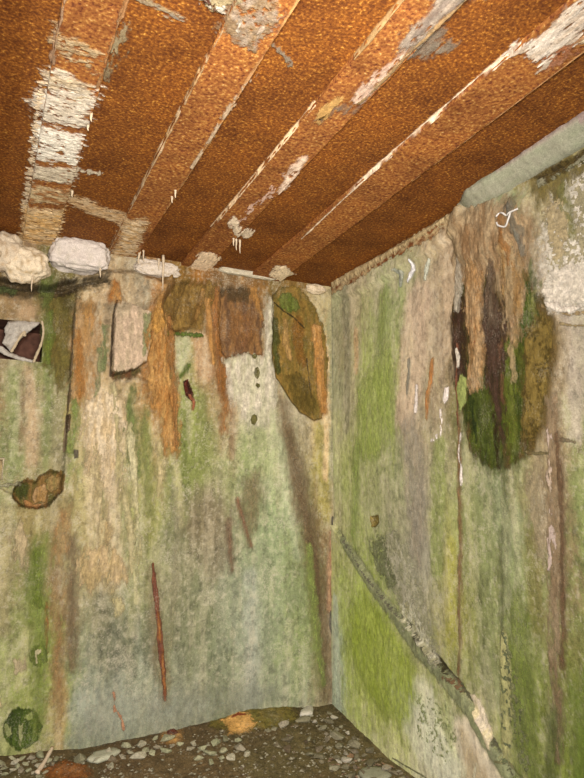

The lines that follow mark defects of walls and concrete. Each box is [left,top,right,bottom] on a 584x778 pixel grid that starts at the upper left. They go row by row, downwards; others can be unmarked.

spalling [162,280,329,428]
rust [331,214,447,295]
leakage [454,202,523,463]
rust [152,563,168,702]
leakage [369,416,439,668]
crack [327,516,523,778]